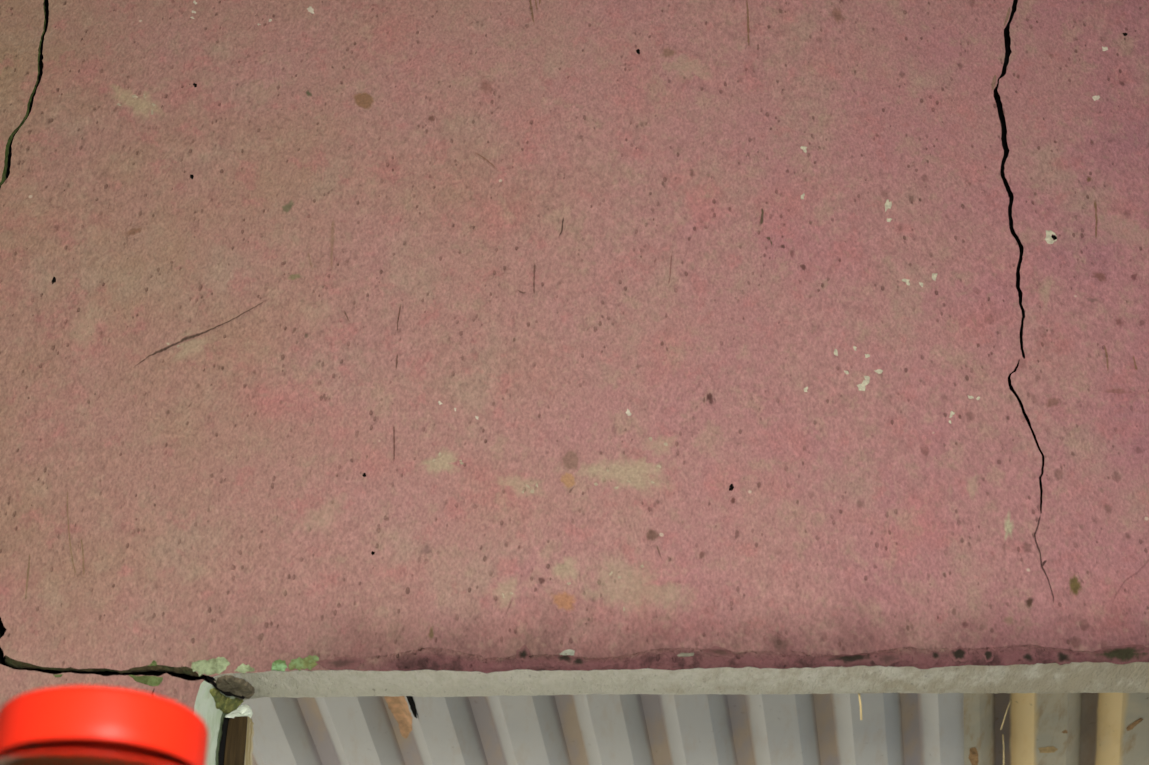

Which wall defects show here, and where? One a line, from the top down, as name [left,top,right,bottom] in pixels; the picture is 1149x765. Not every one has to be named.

crack [0,0,49,189]
crack [991,0,1054,604]
crack [0,617,245,699]